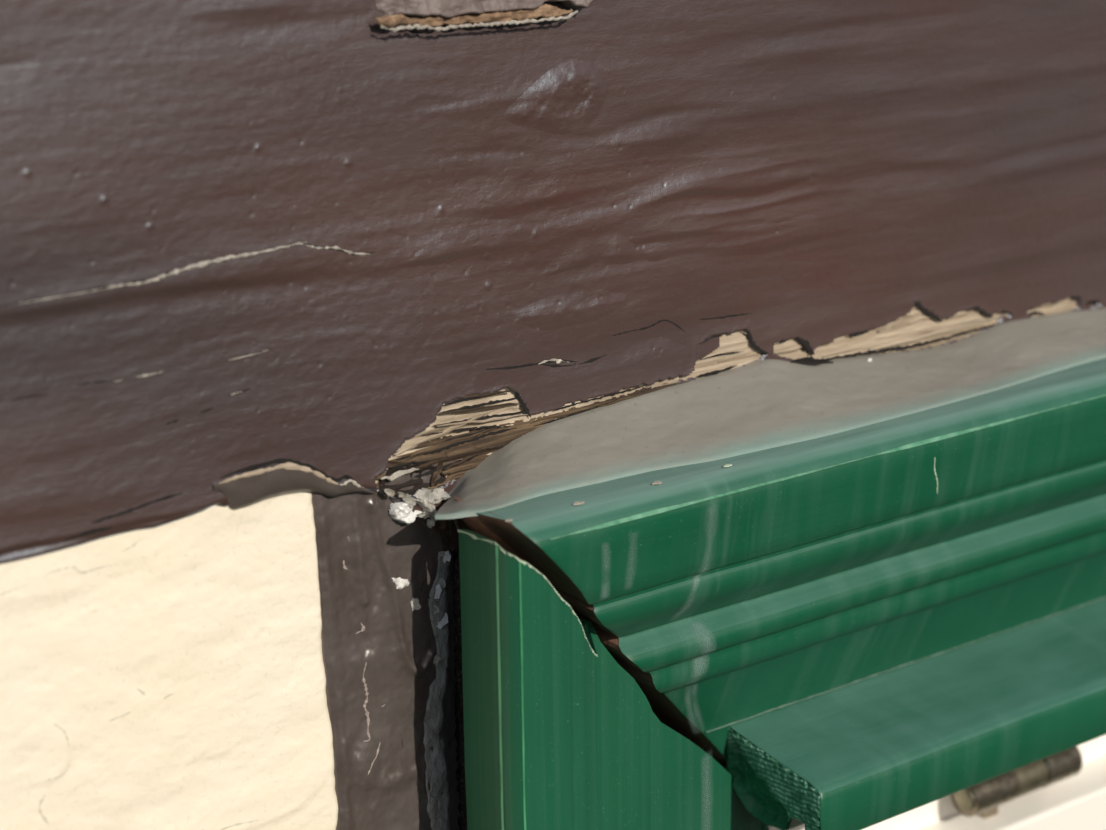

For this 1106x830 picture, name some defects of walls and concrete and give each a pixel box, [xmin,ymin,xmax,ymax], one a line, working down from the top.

peeling [374,0,593,32]
crack [0,242,376,306]
peeling [1027,295,1095,317]
peeling [214,301,1012,534]